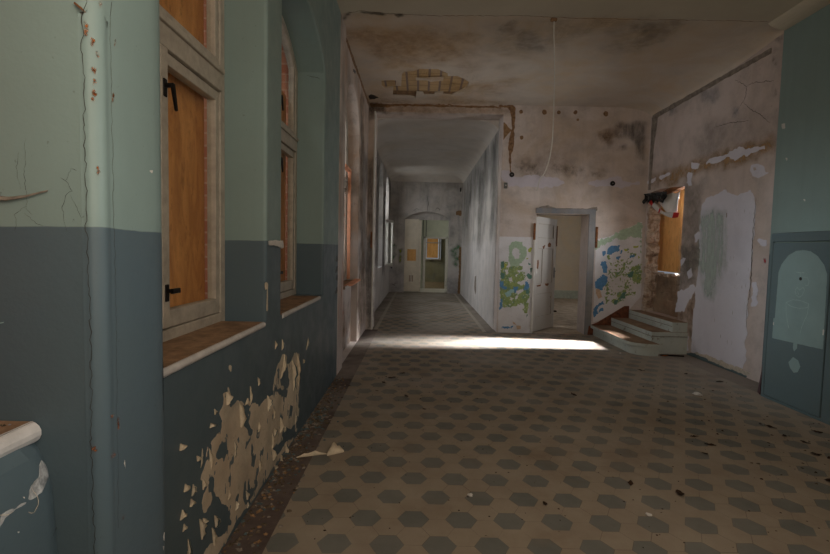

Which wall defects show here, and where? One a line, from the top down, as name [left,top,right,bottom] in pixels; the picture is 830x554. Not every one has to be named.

flaking render [381,69,468,92]
peeling [687,189,756,377]
peeling [180,338,309,554]